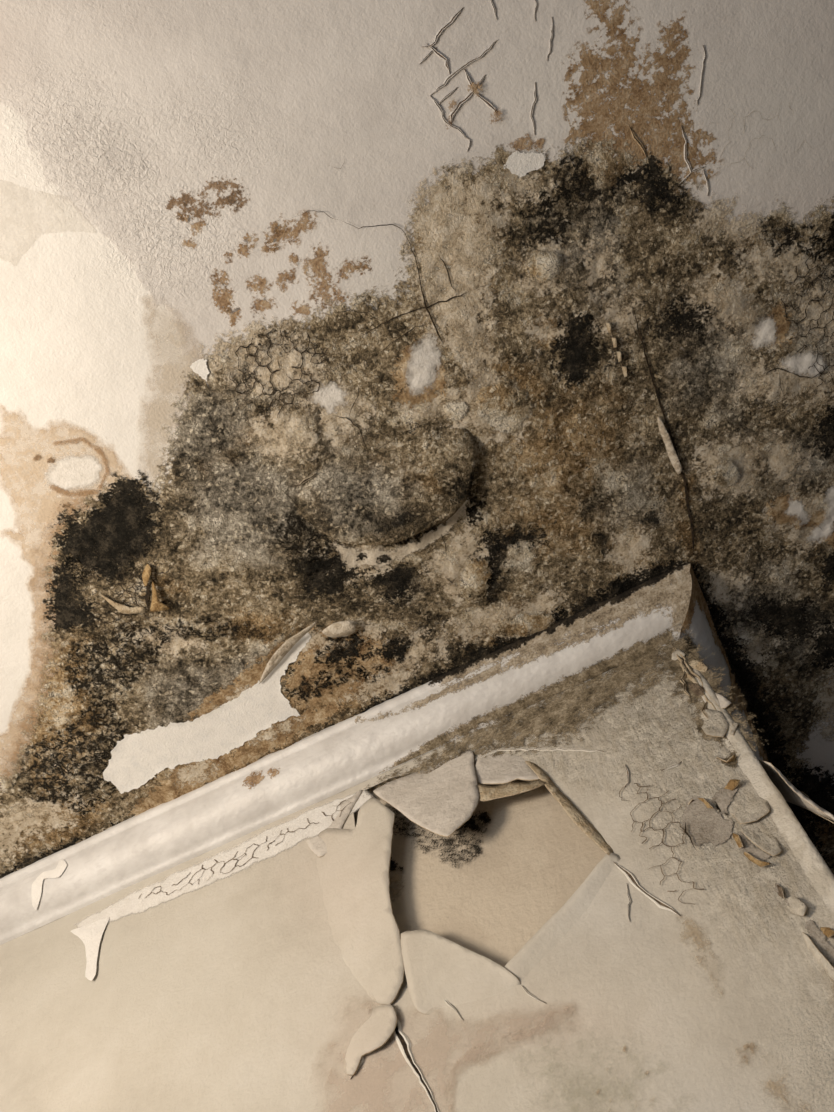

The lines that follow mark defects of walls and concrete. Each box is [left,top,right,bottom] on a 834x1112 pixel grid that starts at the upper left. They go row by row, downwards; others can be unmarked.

crack [420,0,502,151]
crack [529,84,537,135]
damp [0,137,834,879]
crack [606,310,694,550]
flaking render [103,618,413,816]
flaking render [656,633,834,867]
peeling [306,749,620,1076]
spalling [774,883,834,980]
crack [351,1012,440,1112]